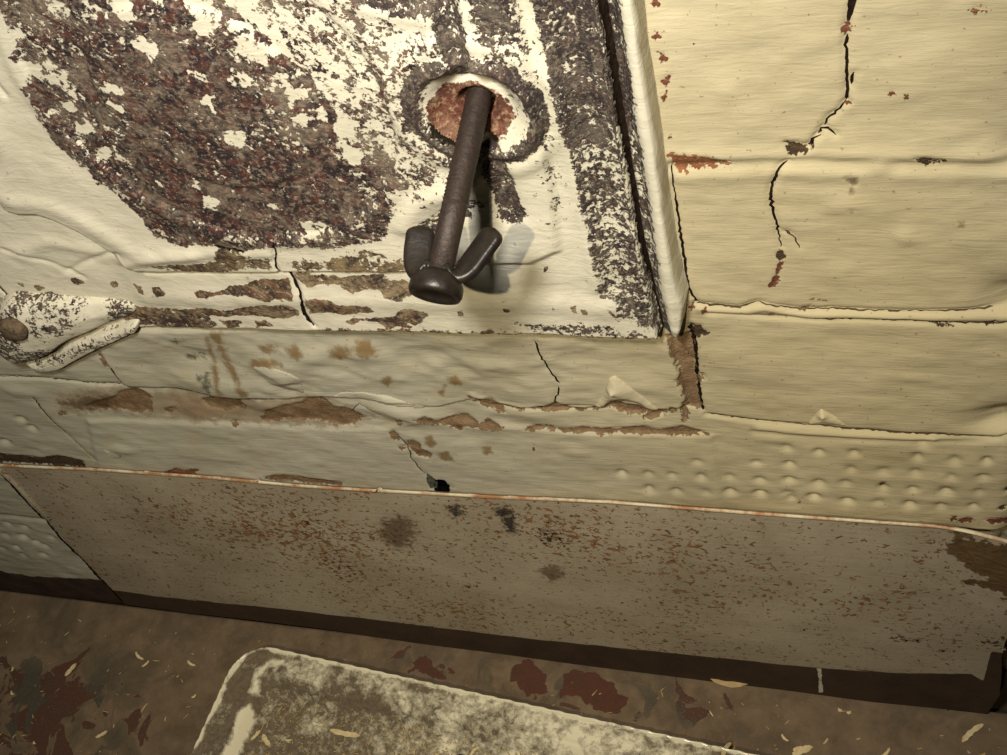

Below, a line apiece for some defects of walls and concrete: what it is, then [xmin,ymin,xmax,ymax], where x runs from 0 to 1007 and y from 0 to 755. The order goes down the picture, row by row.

crack [808,0,856,144]
corrosion [426,80,515,142]
spalling [666,152,731,175]
peeling [0,0,710,437]
crack [272,242,314,326]
peeling [768,249,786,288]
crack [535,342,560,402]
spalling [389,395,505,458]